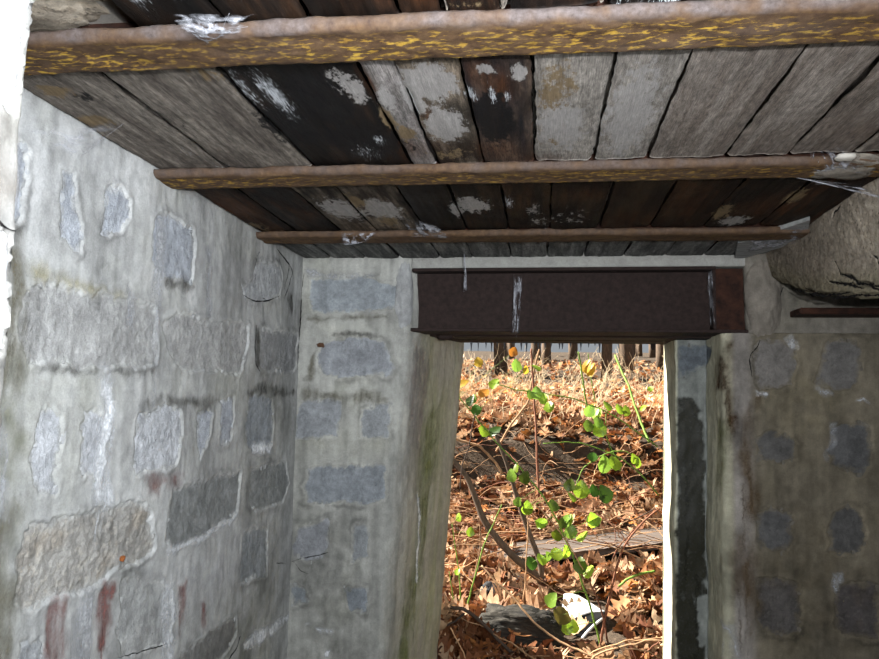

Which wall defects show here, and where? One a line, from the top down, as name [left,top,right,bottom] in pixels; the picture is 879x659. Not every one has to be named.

spalling [0,0,30,113]
spalling [14,142,30,224]
spalling [0,231,8,349]
crack [780,255,879,300]